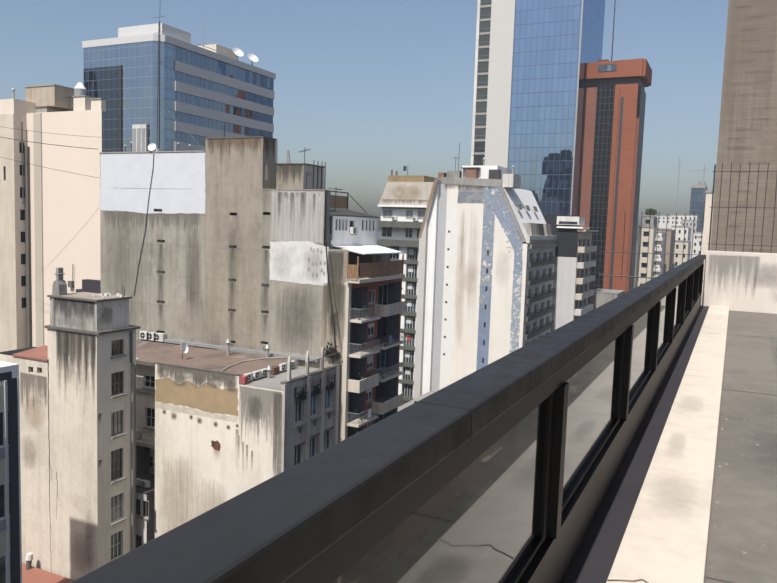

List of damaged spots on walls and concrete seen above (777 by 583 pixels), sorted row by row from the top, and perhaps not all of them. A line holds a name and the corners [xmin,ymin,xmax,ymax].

crack [47,359,59,552]
damp [57,331,94,387]
peeling [155,378,238,429]
damp [158,364,283,474]
peeling [476,266,492,371]
peeling [509,275,522,354]